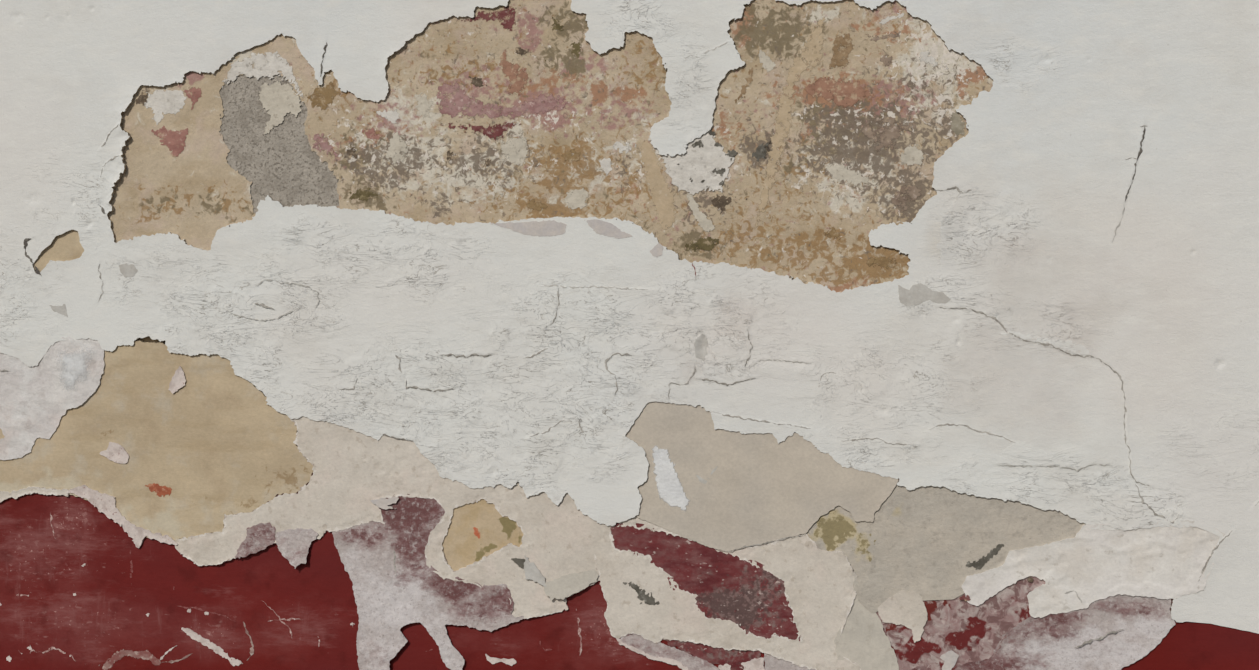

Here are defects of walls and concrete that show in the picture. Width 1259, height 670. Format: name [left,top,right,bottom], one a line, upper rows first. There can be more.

spalling [109,0,993,306]
crack [1112,125,1146,242]
spalling [34,230,84,272]
crack [395,355,453,392]
crack [443,351,491,359]
crack [526,285,647,358]
crack [604,353,629,394]
crack [668,330,836,429]
crack [852,307,1177,523]
peeling [0,334,1225,670]